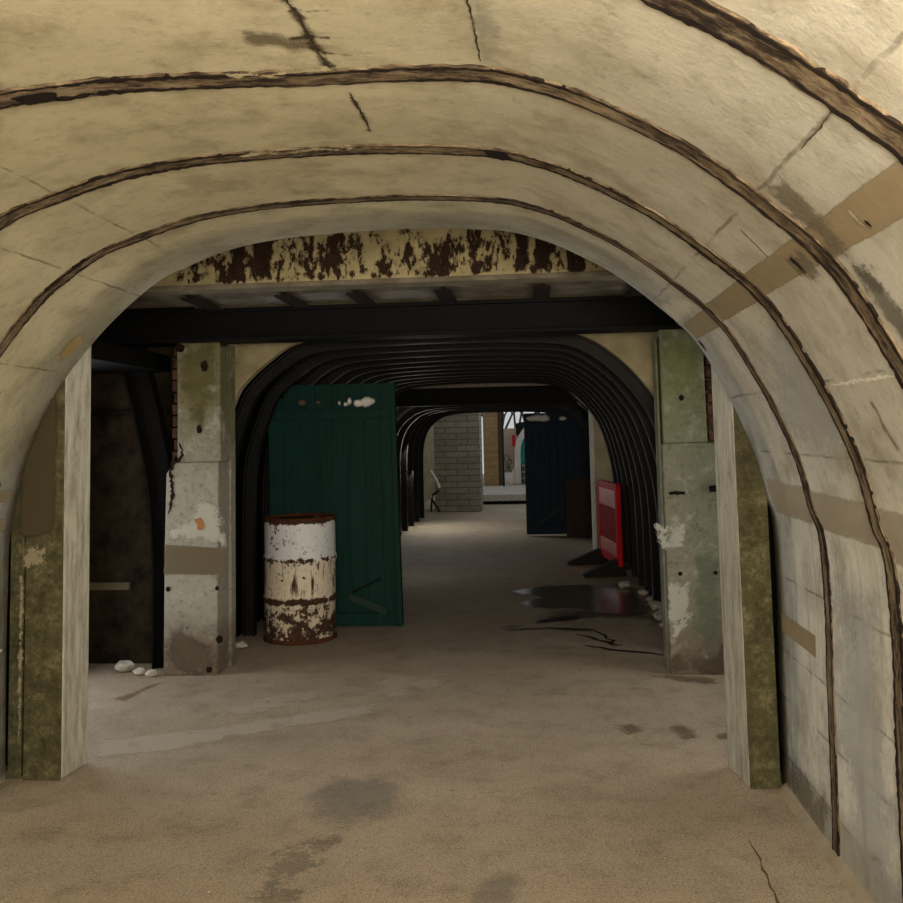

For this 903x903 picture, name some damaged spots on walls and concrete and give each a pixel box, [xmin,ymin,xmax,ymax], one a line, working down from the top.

crack [283,0,350,69]
crack [466,0,481,62]
crack [350,93,371,132]
peeling [169,499,226,547]
peeling [654,521,686,549]
damp [508,602,655,631]
peeling [668,581,692,643]
crack [748,840,779,903]